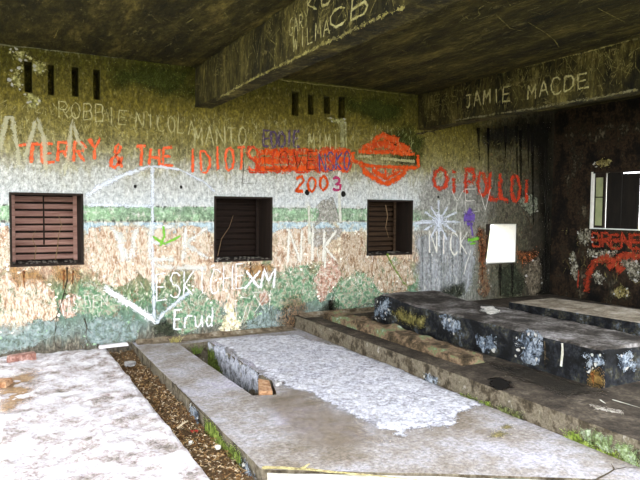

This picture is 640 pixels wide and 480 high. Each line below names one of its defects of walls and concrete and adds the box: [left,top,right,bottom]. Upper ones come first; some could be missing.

leakage [515,124,534,224]
rust [478,231,486,284]
crack [50,267,92,346]